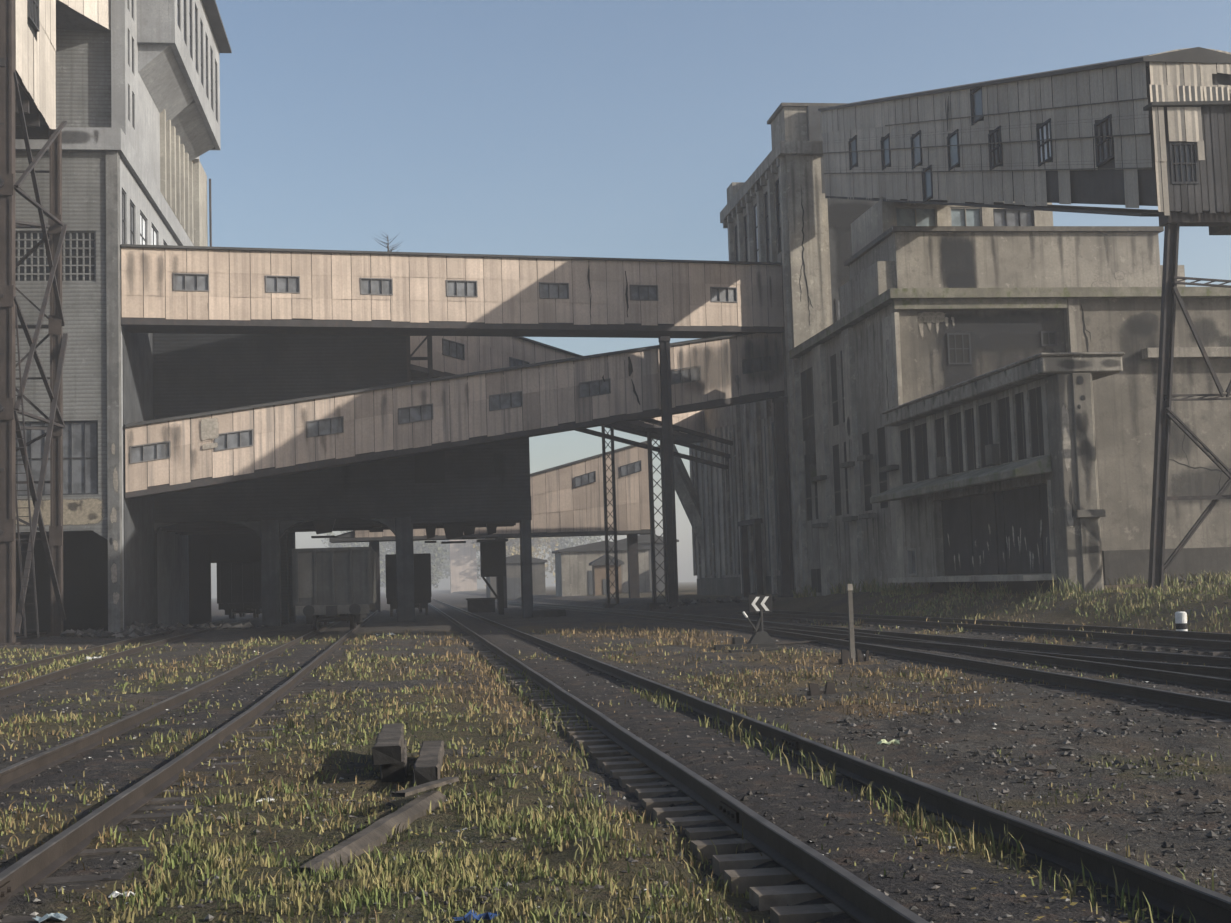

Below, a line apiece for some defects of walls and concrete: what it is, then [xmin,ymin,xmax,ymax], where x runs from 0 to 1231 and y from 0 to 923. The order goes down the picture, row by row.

crack [585,266,593,315]
crack [623,271,631,317]
crack [602,356,640,405]
water stain [1077,414,1092,490]